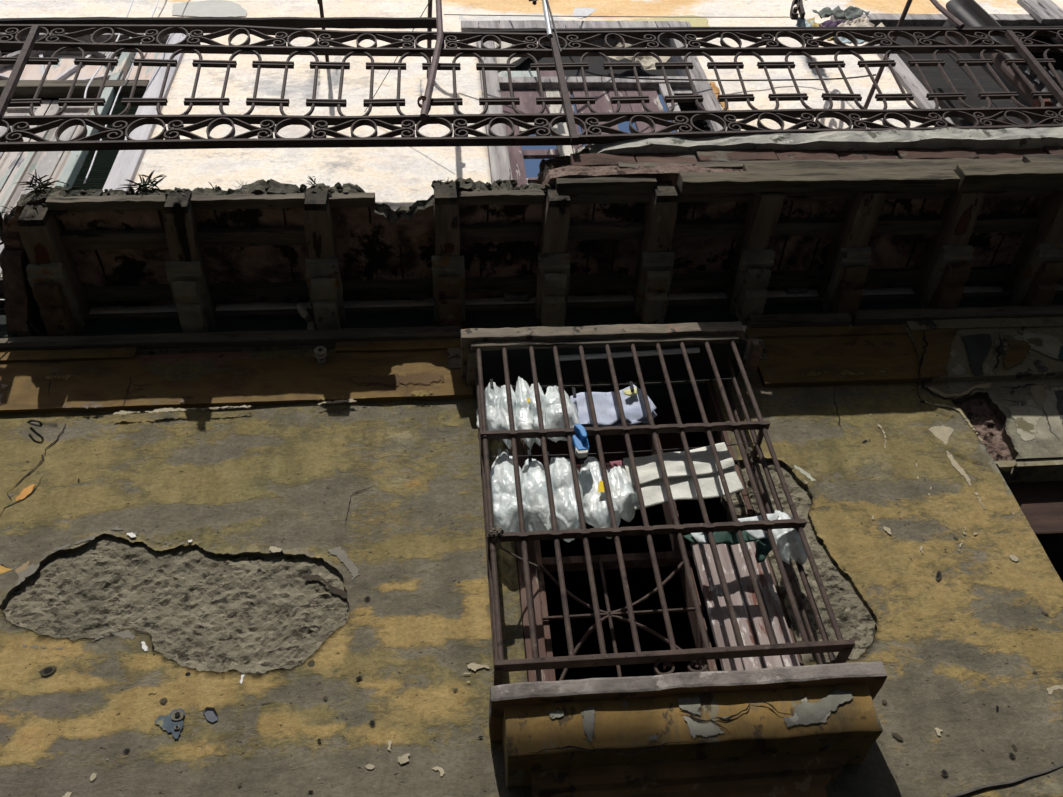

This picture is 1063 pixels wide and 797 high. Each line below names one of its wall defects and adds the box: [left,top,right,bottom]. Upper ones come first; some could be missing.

crack [915,324,972,404]
flaking render [920,332,1063,473]
crack [992,333,1059,439]
crack [0,423,67,516]
peeling [929,425,985,509]
spalling [0,526,360,684]
spalling [724,460,876,664]
peeling [677,697,729,738]
peeling [784,689,853,727]